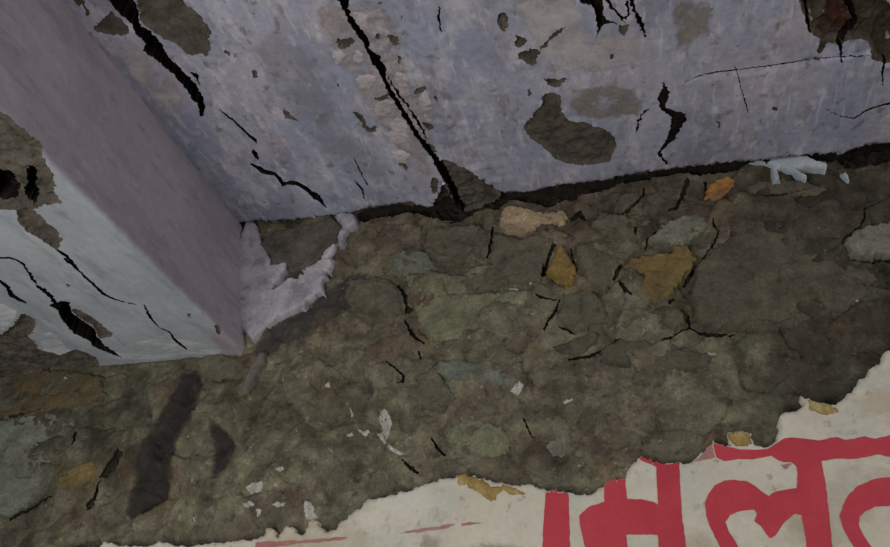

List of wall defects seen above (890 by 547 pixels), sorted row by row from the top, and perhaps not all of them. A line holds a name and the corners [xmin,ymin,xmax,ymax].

flaking render [136,0,212,57]
flaking render [799,0,890,63]
flaking render [0,111,63,250]
crack [109,0,334,217]
flaking render [524,77,617,166]
crack [337,0,890,264]
crack [0,257,120,357]
crack [56,250,187,349]
flaking render [0,155,890,547]
crack [535,243,578,335]
damp [127,374,202,516]
damp [210,424,234,476]